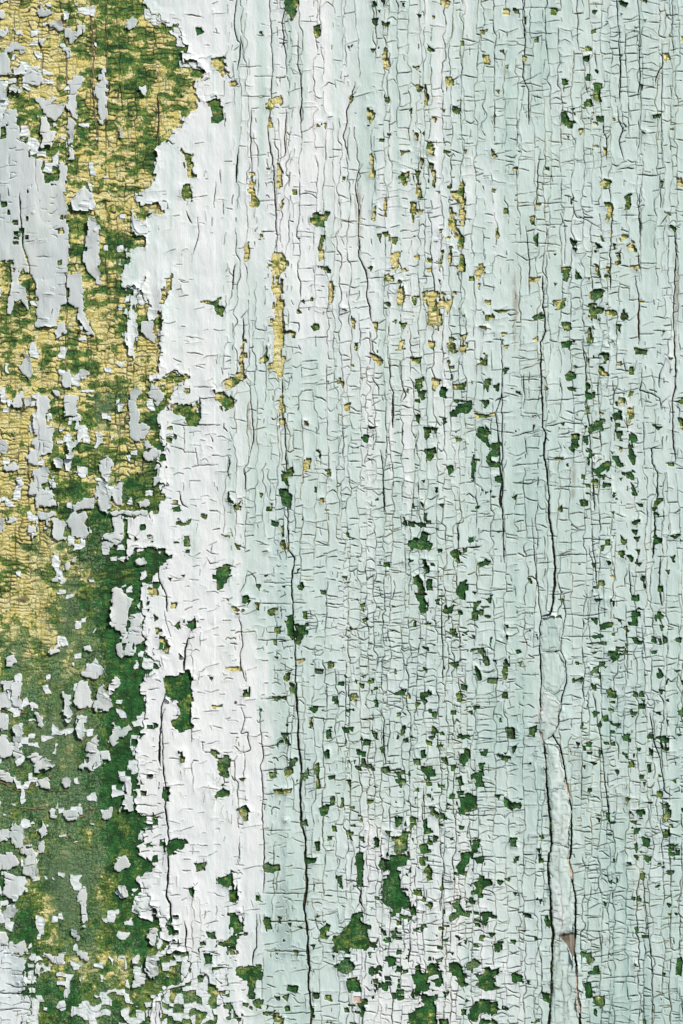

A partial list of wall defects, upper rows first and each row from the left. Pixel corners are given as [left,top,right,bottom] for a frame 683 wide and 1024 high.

crack [154,95,162,142]
peeling [309,211,384,366]
peeling [358,84,525,510]
peeling [0,0,313,1024]
crack [156,553,212,671]
peeling [259,449,331,553]
crack [167,0,683,1024]
peeling [528,178,683,925]
crack [138,689,187,947]
peeling [263,498,553,1024]
peeling [535,897,611,1017]
peeling [662,957,683,979]